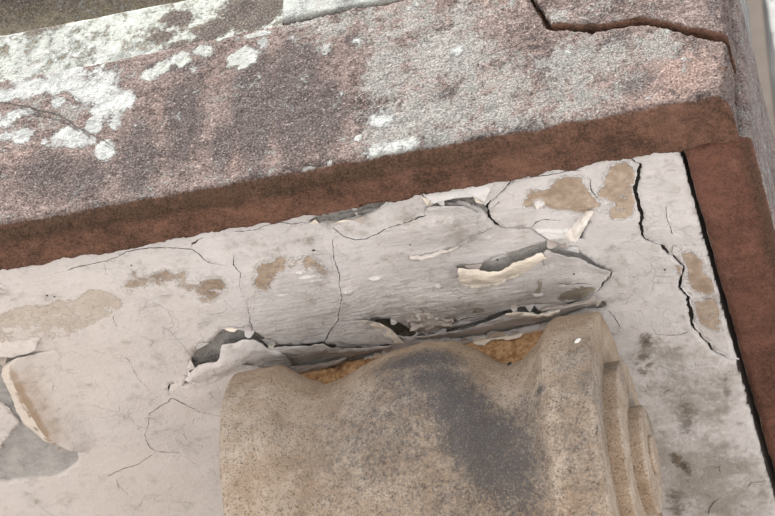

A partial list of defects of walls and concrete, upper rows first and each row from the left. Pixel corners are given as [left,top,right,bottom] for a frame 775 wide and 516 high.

crack [0,102,114,148]
crack [58,238,255,331]
peeling [309,202,390,225]
crack [325,215,426,340]
peeling [400,183,494,262]
peeling [449,211,609,288]
crack [470,170,602,239]
crack [558,272,614,297]
crack [633,158,739,360]
peeling [185,295,606,390]
peeling [0,337,96,480]
crack [109,354,221,498]